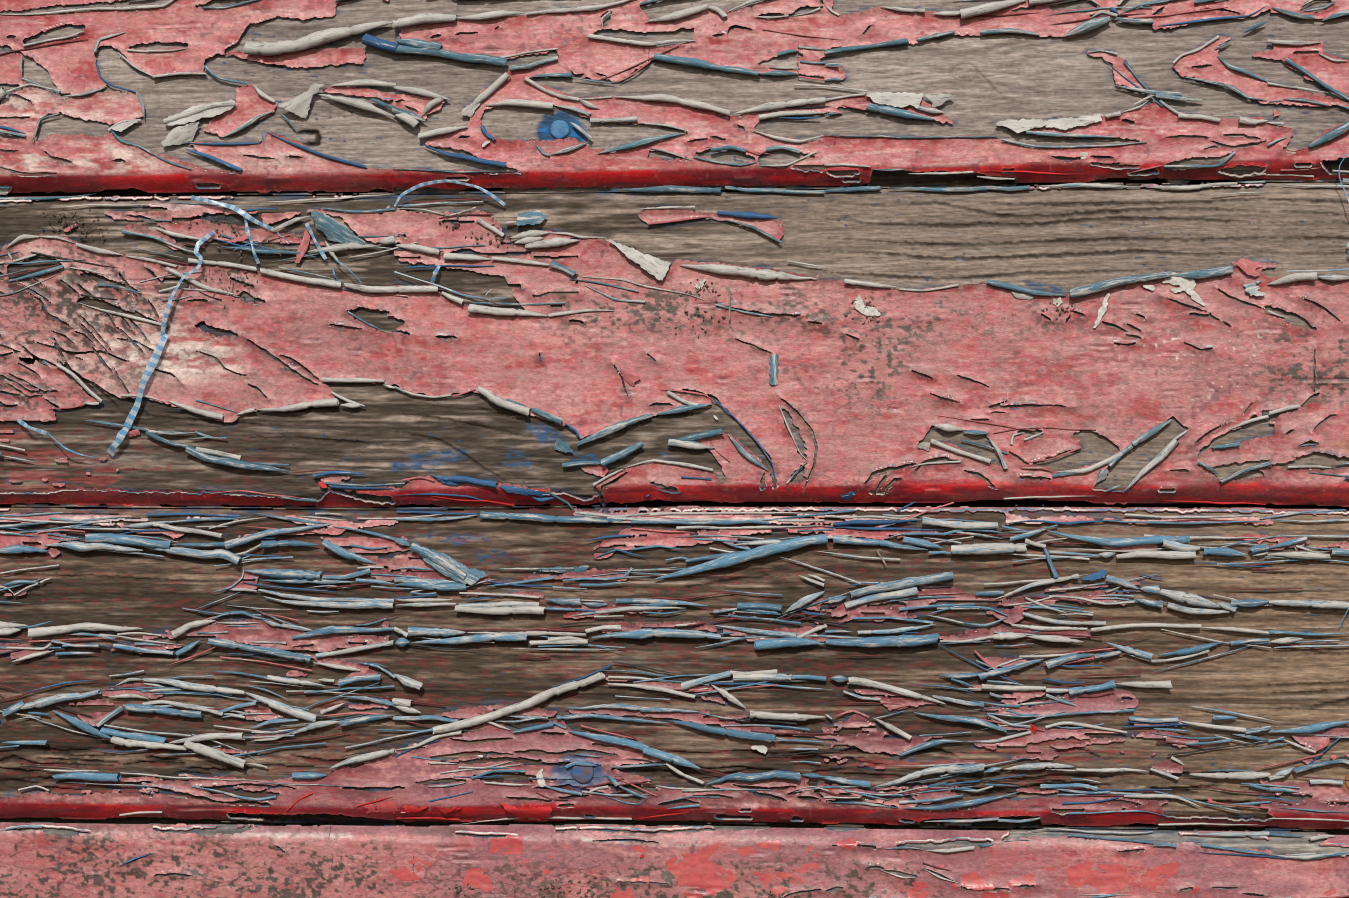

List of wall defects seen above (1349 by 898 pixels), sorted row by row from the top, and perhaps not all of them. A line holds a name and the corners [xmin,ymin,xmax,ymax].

peeling [0,0,1349,353]
peeling [0,321,1349,868]